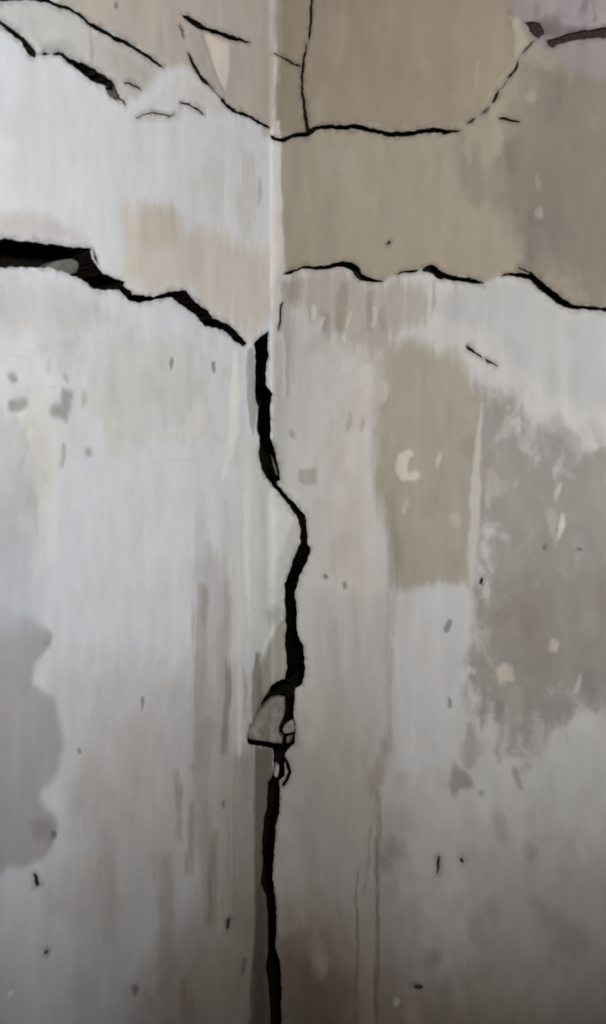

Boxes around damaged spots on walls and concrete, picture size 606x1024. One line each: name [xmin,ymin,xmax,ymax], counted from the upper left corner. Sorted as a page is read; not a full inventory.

water stain [0,133,301,1024]
crack [0,238,310,1024]
crack [0,0,534,142]
water stain [268,261,606,1024]
crack [284,261,606,312]
crack [466,345,497,366]